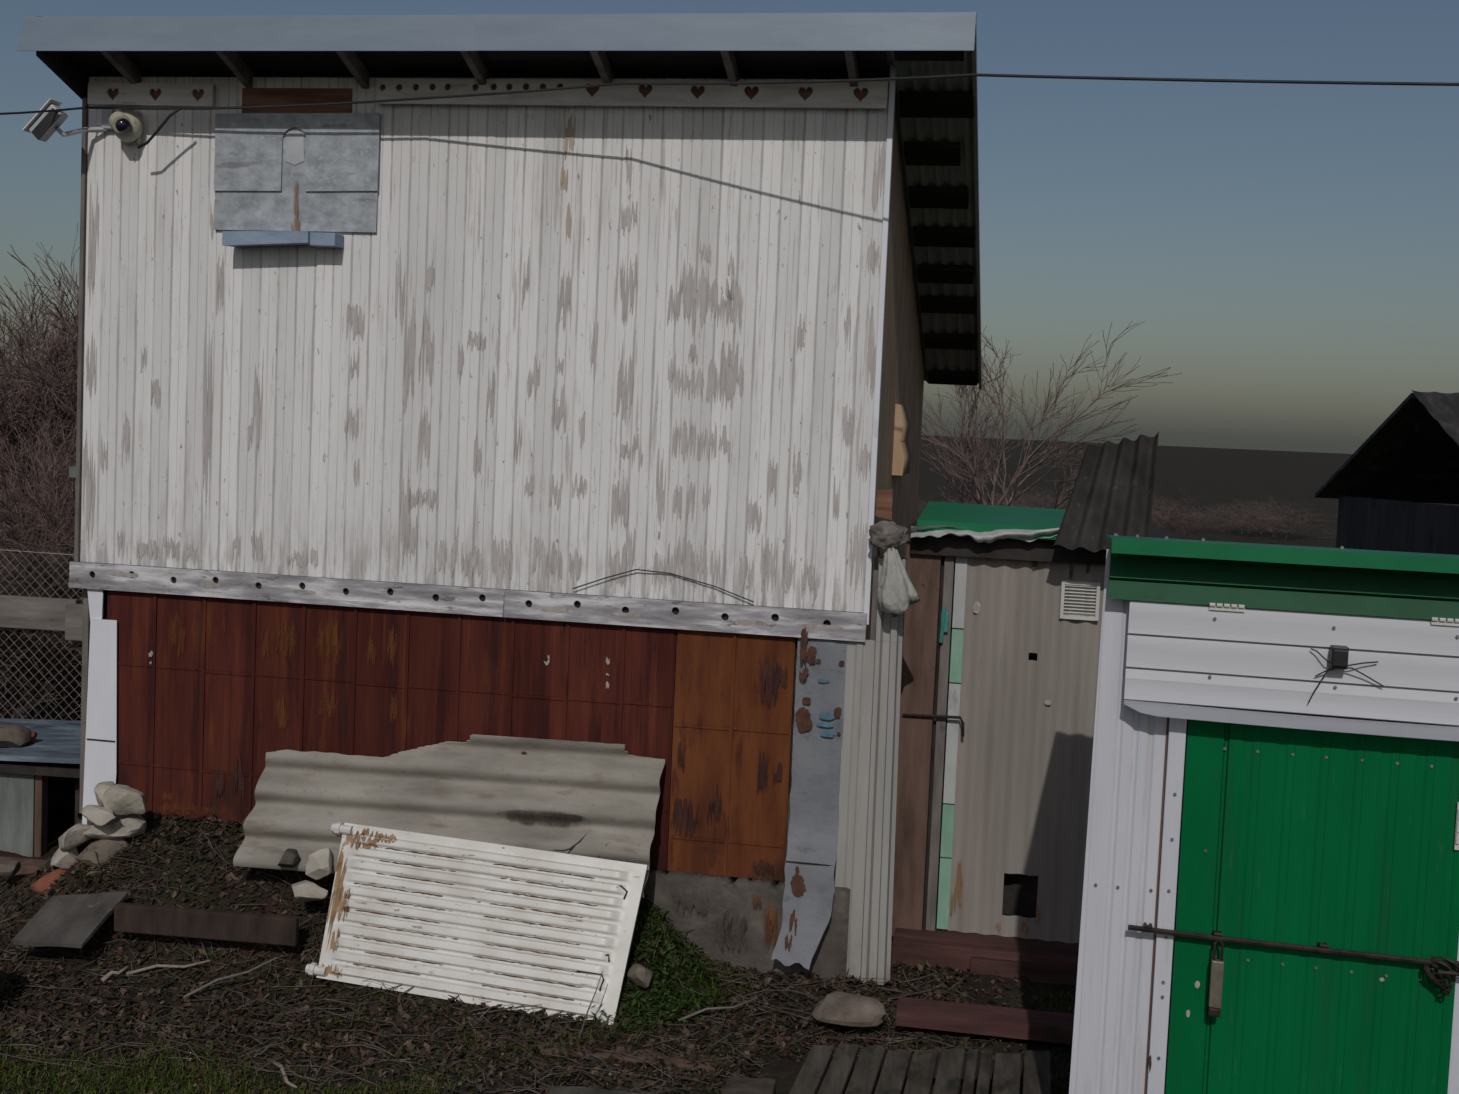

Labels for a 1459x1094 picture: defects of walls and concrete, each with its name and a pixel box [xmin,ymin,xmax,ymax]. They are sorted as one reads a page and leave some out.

peeling [560,114,576,241]
peeling [83,411,130,530]
peeling [203,201,224,506]
peeling [395,248,513,582]
peeling [513,422,587,509]
peeling [527,354,585,448]
peeling [557,272,571,335]
peeling [609,241,744,595]
peeling [739,447,820,604]
peeling [844,305,876,399]
corrosion [795,627,821,733]
corrosion [753,866,806,952]